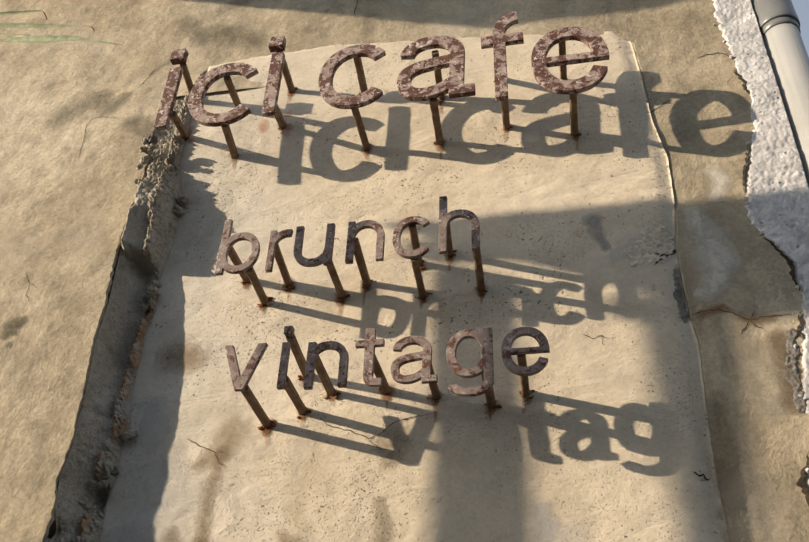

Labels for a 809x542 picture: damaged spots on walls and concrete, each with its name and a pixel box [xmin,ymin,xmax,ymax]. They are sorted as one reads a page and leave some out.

peeling [712,0,809,415]
leakage [4,319,25,346]
spalling [43,69,208,542]
crack [693,309,787,334]
crack [320,407,445,450]
peeling [796,451,809,506]